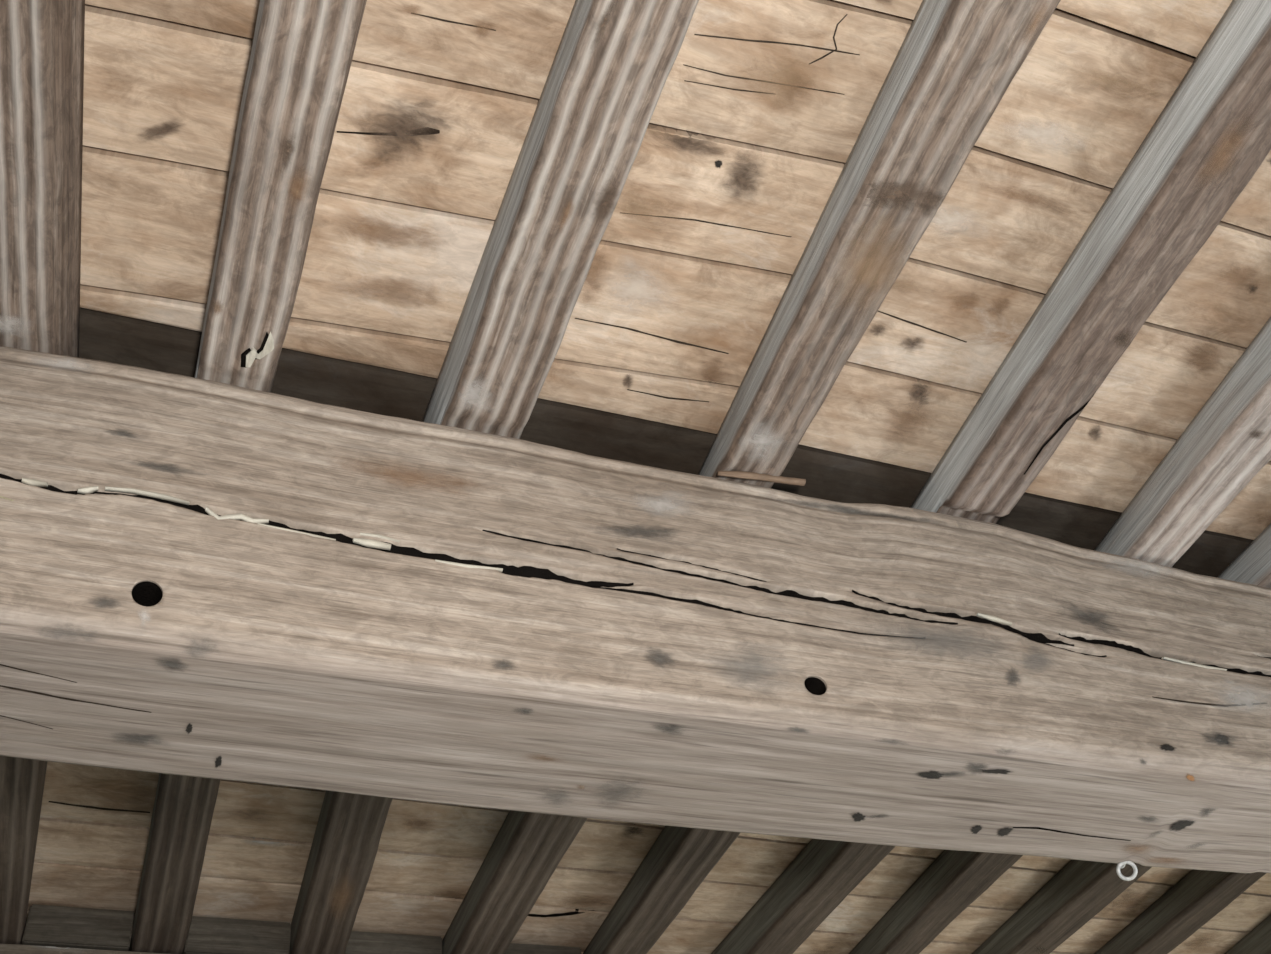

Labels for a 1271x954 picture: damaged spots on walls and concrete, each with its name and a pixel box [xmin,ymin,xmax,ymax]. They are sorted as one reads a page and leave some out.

crack [683,14,860,95]
crack [1024,392,1096,475]
crack [0,474,1271,707]